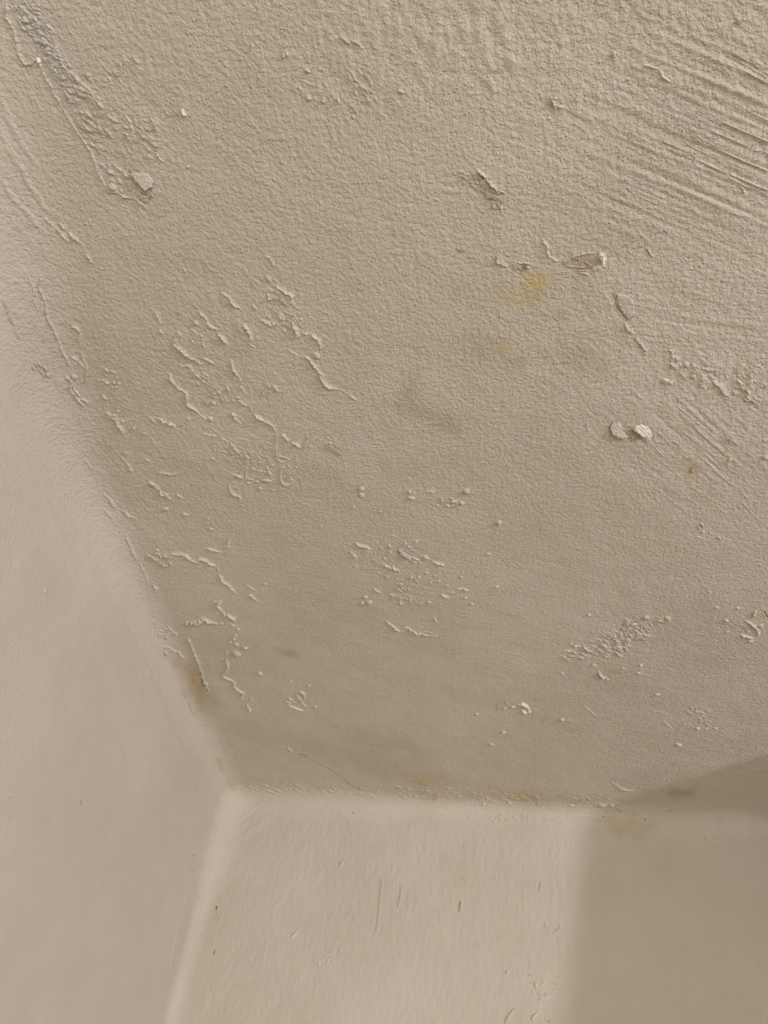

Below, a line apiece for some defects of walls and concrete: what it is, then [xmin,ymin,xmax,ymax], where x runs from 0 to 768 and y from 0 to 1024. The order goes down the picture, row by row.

flaking render [4,0,187,214]
peeling [560,250,607,276]
peeling [148,255,360,507]
leakage [372,255,627,445]
peeling [595,422,652,473]
flaking render [144,538,267,602]
peeling [350,535,469,639]
peeling [181,600,241,641]
peeling [556,615,672,664]